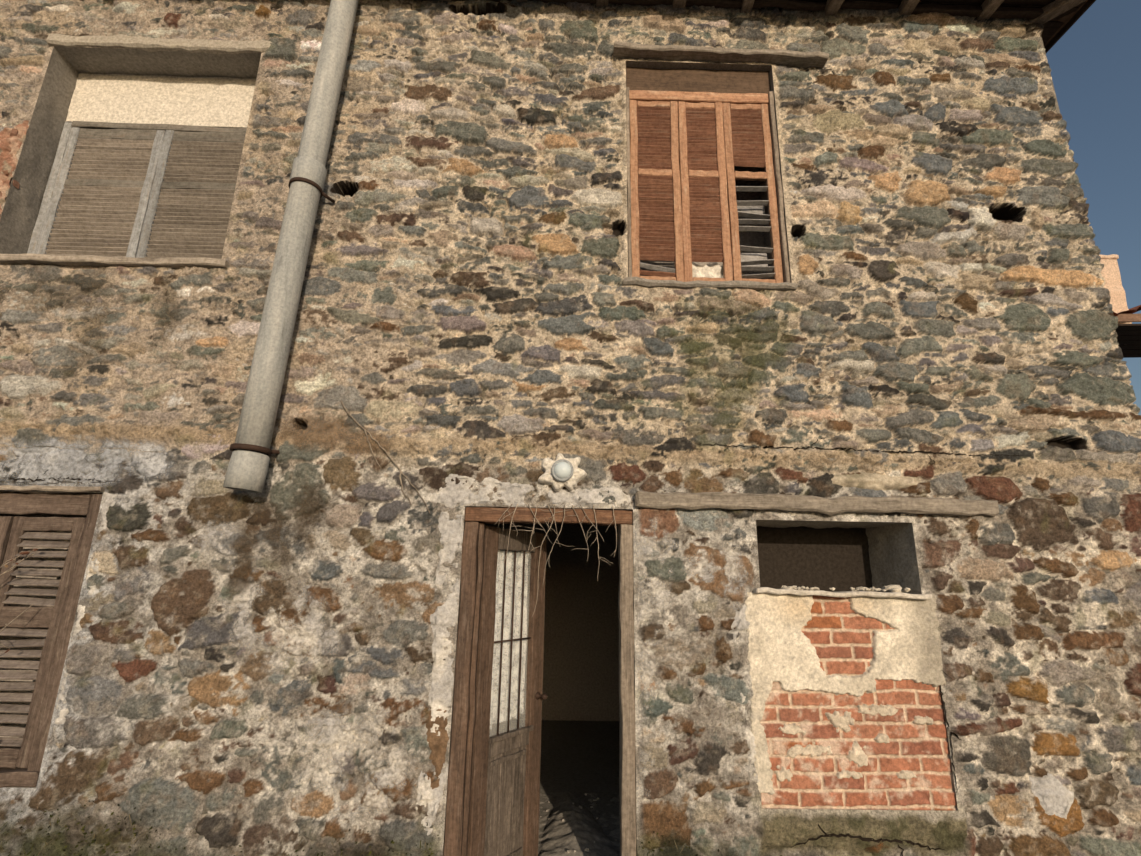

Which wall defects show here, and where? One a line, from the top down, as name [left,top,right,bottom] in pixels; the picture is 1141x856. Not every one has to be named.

peeling [647,577,670,610]
flaking render [685,543,946,795]
crack [791,817,945,856]